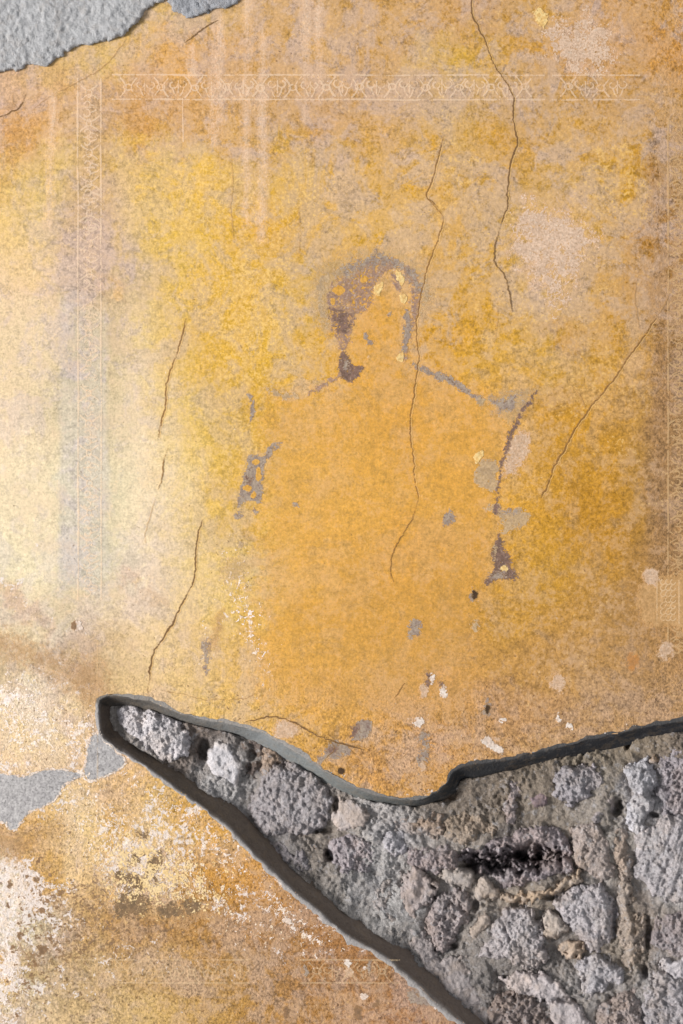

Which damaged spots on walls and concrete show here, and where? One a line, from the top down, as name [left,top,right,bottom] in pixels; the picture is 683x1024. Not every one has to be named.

crack [471,0,518,341]
crack [144,319,186,543]
crack [390,138,444,582]
crack [541,276,672,497]
spalling [0,694,683,1024]